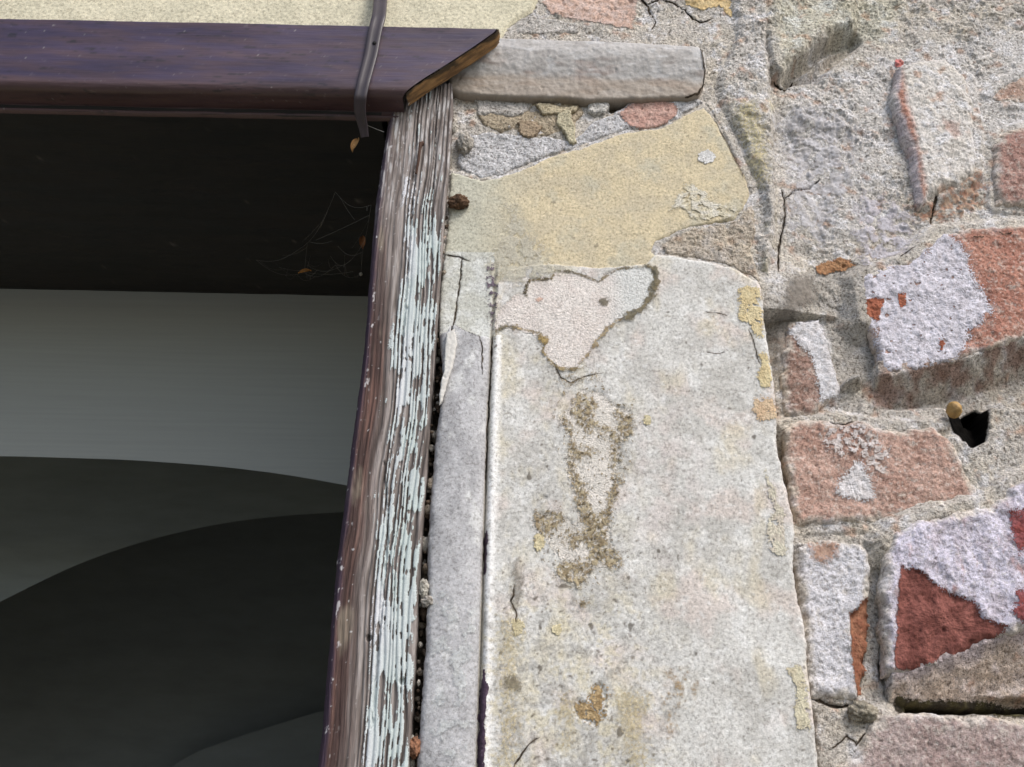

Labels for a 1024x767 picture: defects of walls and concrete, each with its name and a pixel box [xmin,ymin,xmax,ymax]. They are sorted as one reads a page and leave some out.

crack [777,179,820,272]
spalling [486,263,654,369]
spalling [865,297,884,322]
crack [447,255,493,491]
peeling [361,110,457,767]
spalling [948,411,989,448]
spalling [1006,508,1024,556]
spalling [894,565,1024,671]